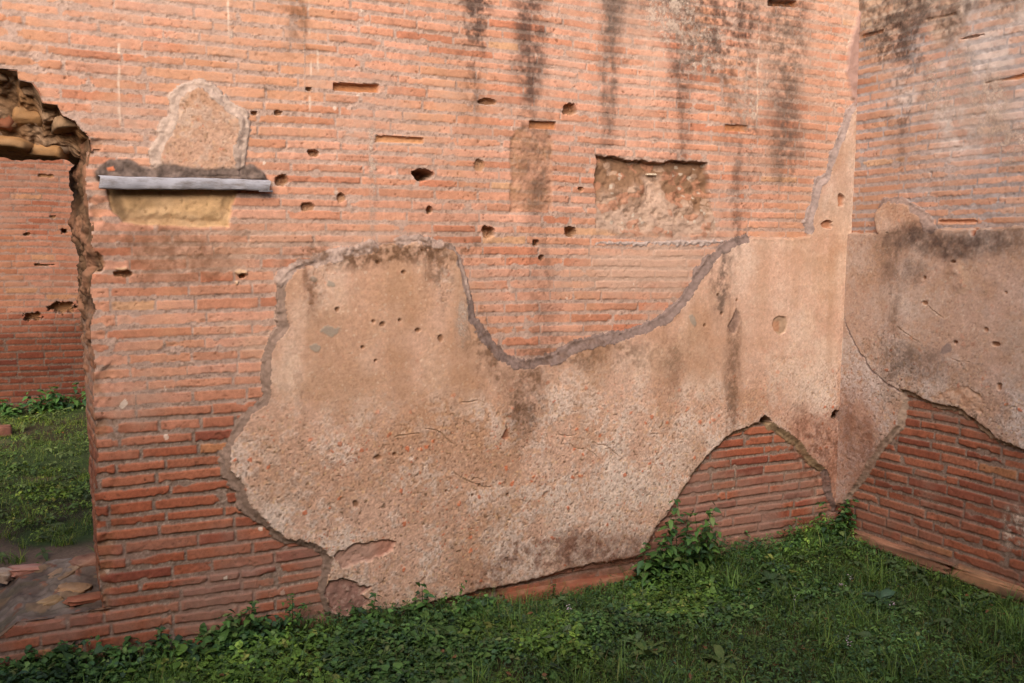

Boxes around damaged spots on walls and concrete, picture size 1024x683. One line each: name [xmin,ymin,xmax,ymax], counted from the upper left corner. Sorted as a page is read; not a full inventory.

spalling [333,82,380,93]
leakage [465,0,488,45]
leakage [517,2,543,102]
leakage [648,0,751,98]
leakage [867,0,937,56]
spalling [108,189,238,228]
spalling [375,134,424,144]
spalling [509,120,556,213]
spalling [593,154,717,241]
leakage [903,226,1008,258]
spalling [642,385,1024,588]
peeling [324,538,397,616]